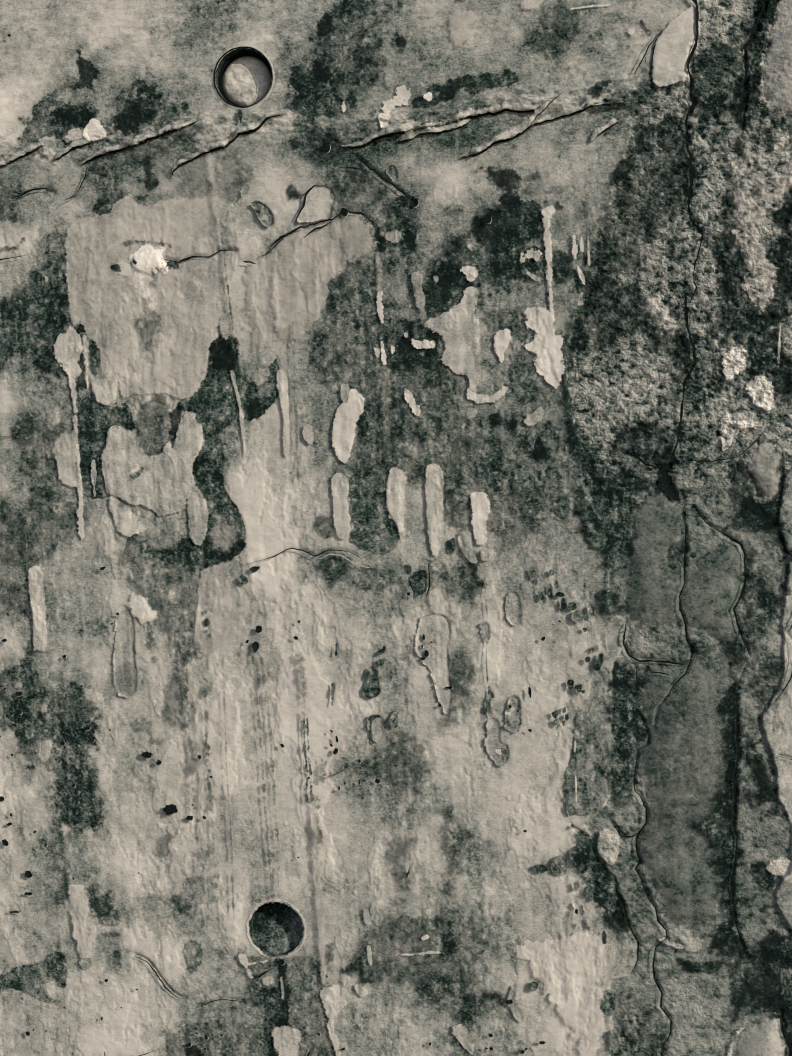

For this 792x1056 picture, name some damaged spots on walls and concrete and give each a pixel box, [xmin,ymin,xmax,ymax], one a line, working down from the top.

crack [14,167,87,200]
crack [161,155,415,264]
water stain [0,226,70,378]
peeling [404,266,508,404]
spalling [74,313,280,586]
peeling [332,383,365,463]
spalling [348,469,400,555]
crack [612,0,767,1056]
water stain [659,0,792,1056]
crack [778,528,792,557]
water stain [0,635,105,908]
water stain [513,894,673,1056]